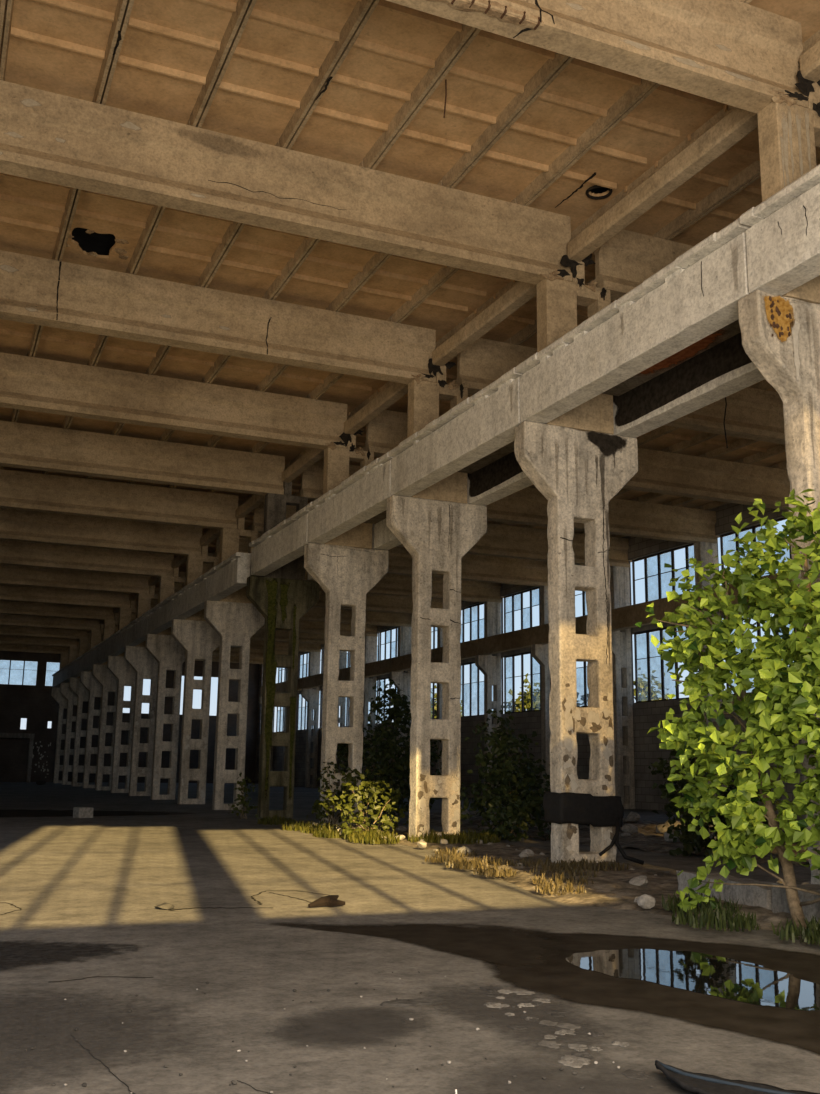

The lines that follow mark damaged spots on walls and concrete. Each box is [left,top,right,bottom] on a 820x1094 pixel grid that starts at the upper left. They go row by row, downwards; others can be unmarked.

crack [513,0,555,38]
spalling [768,71,820,117]
corrosion [764,295,800,380]
crack [70,1034,135,1094]